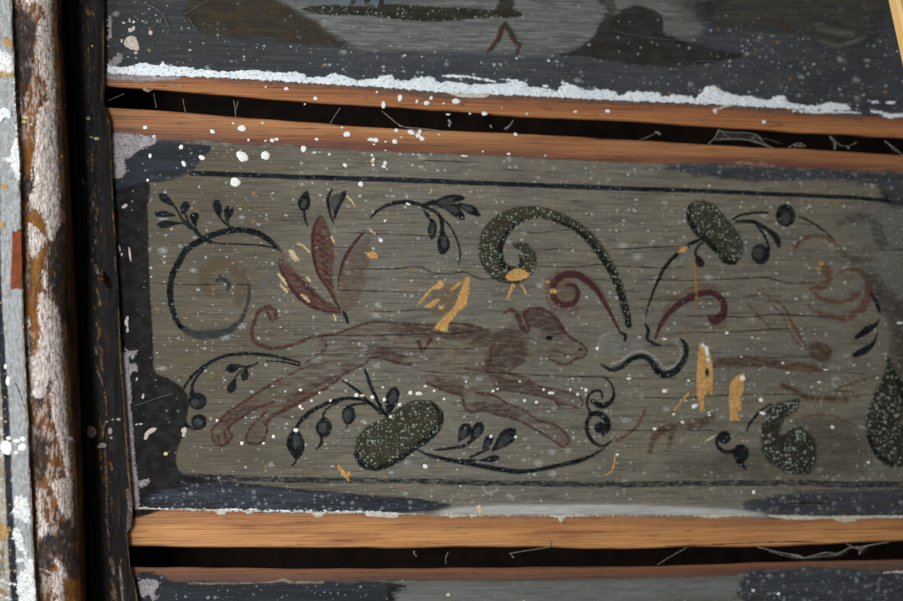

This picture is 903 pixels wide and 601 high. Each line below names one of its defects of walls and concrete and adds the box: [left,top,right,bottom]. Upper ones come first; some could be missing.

water stain [442,74,518,83]
water stain [341,85,548,106]
water stain [557,98,903,119]
peeling [0,0,74,520]
peeling [0,451,81,601]
peeling [389,578,740,601]